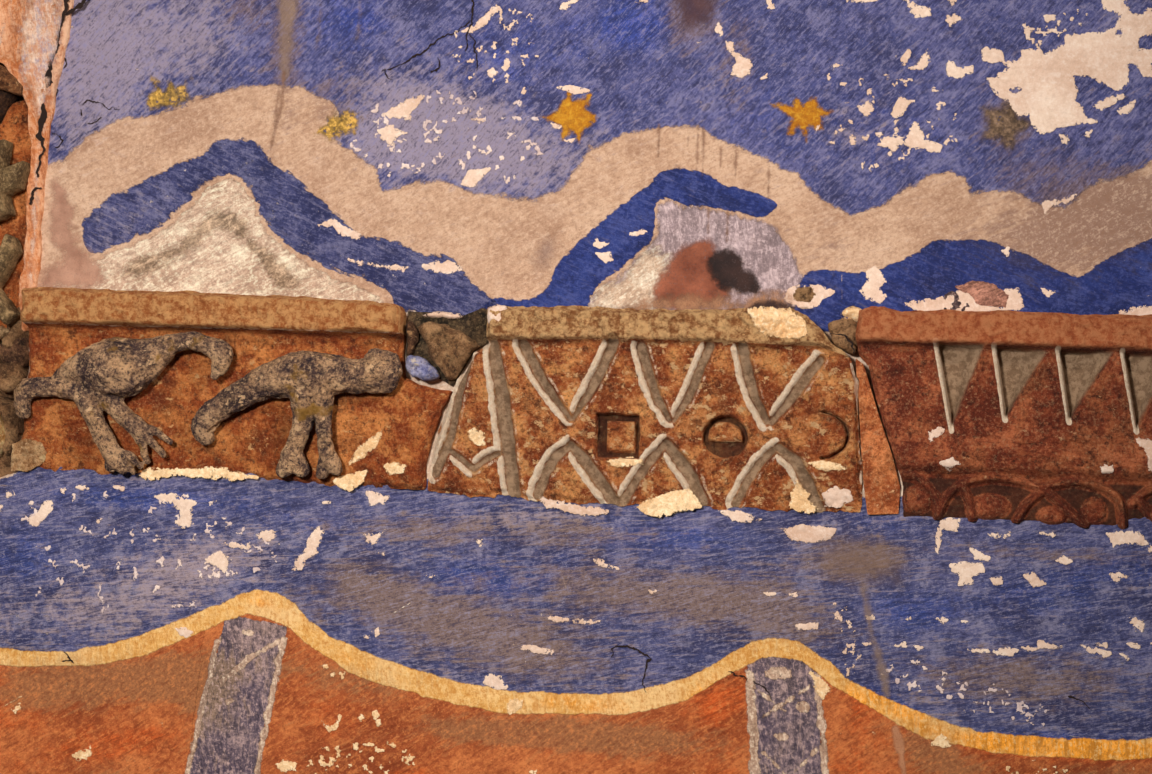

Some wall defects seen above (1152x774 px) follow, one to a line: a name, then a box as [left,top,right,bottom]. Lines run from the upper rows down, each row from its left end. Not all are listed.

crack [382,0,478,80]
crack [29,0,120,205]
peeling [371,4,539,187]
peeling [945,0,1152,144]
peeling [139,466,258,481]
peeling [21,484,89,527]
peeling [148,493,277,579]
peeling [292,526,325,571]
peeling [949,547,1003,586]
peeling [1106,531,1152,552]
crack [611,645,652,692]
peeling [275,741,415,774]